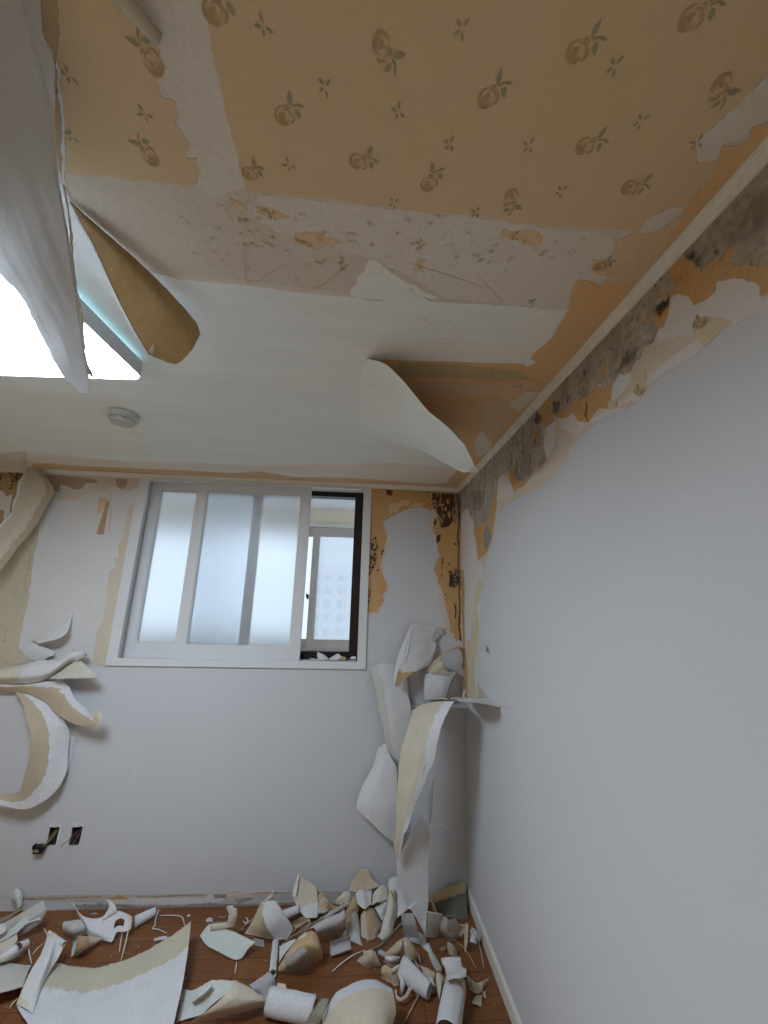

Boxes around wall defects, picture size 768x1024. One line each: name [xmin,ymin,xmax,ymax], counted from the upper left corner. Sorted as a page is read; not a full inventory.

spalling [682,164,768,272]
peeling [24,270,675,697]
peeling [0,889,296,911]